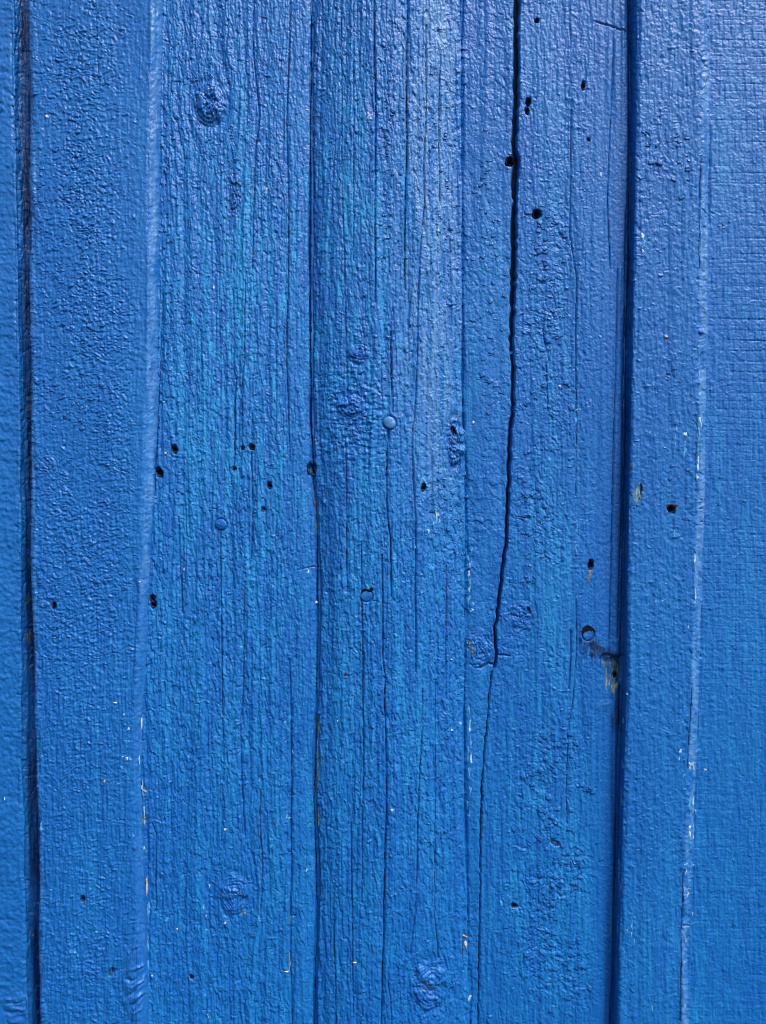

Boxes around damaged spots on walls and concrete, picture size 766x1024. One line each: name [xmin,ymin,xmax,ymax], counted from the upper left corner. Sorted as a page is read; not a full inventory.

crack [333,0,519,1024]